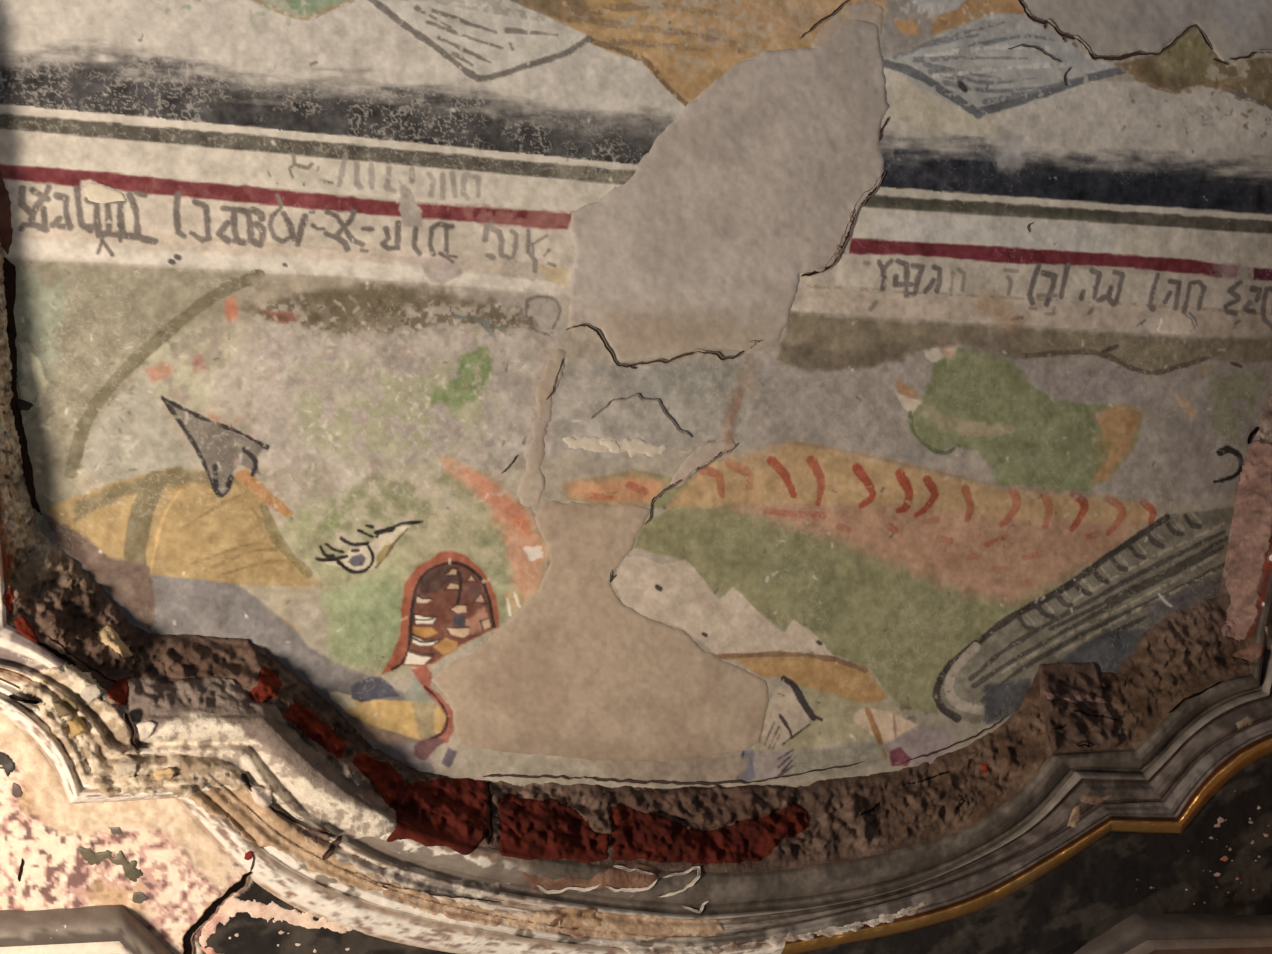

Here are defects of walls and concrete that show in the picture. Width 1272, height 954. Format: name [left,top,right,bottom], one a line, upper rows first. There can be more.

spalling [0,171,42,515]
flaking render [2,587,40,643]
spalling [95,625,133,658]
spalling [1221,438,1272,666]
crack [181,856,255,954]
flaking render [9,662,926,954]